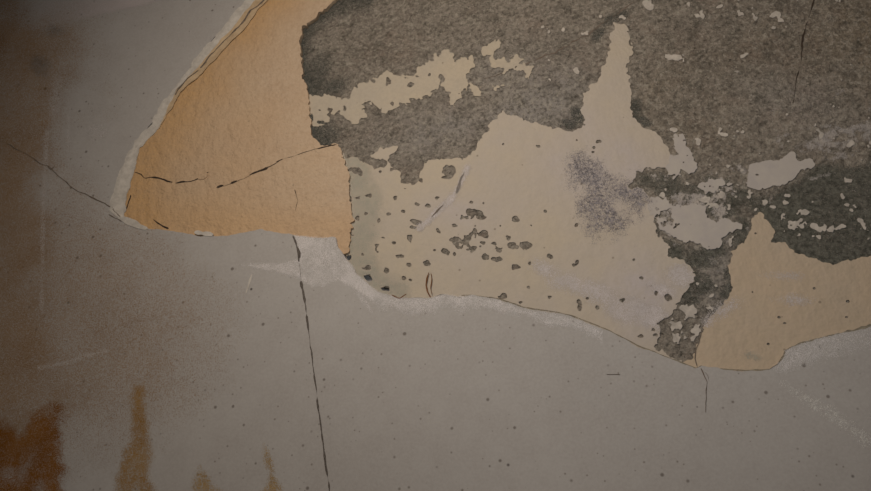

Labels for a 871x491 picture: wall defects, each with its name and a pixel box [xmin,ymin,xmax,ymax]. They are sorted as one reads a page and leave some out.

water stain [590,9,630,44]
crack [793,0,815,103]
water stain [630,98,652,128]
crack [0,141,131,222]
crack [135,144,336,188]
spalling [109,0,871,371]
water stain [527,104,871,331]
crack [293,236,330,491]
corrosion [113,382,157,491]